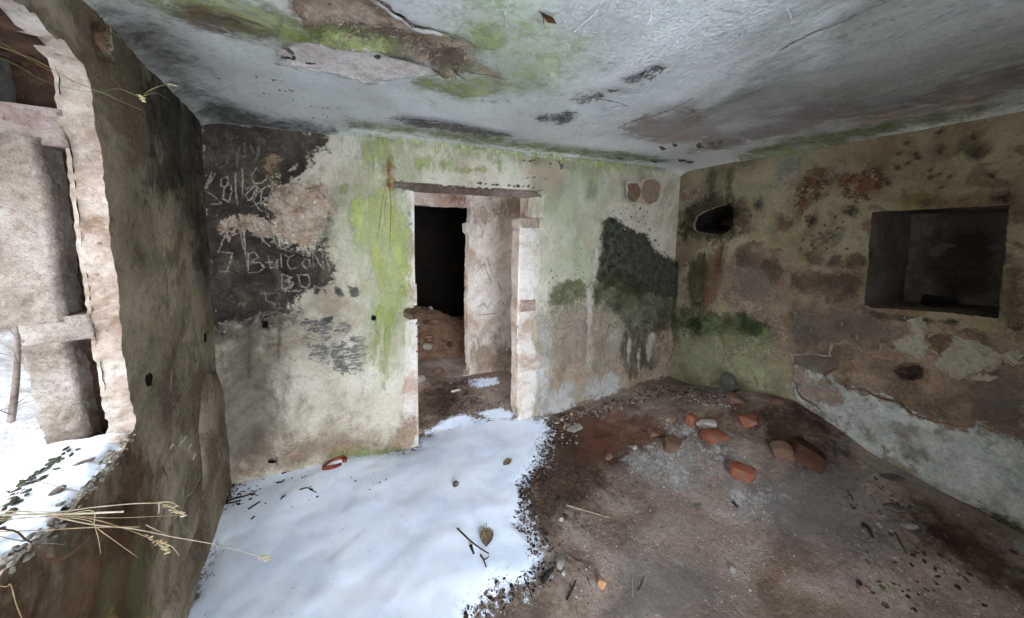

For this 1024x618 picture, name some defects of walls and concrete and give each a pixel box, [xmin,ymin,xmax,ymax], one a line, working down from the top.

spalling [271,0,481,101]
spalling [216,150,338,248]
spalling [626,176,662,204]
damp [221,328,417,476]
damp [371,287,405,386]
damp [538,197,1024,443]
peeling [791,353,837,372]
peeling [844,377,967,427]
peeling [891,316,1024,382]